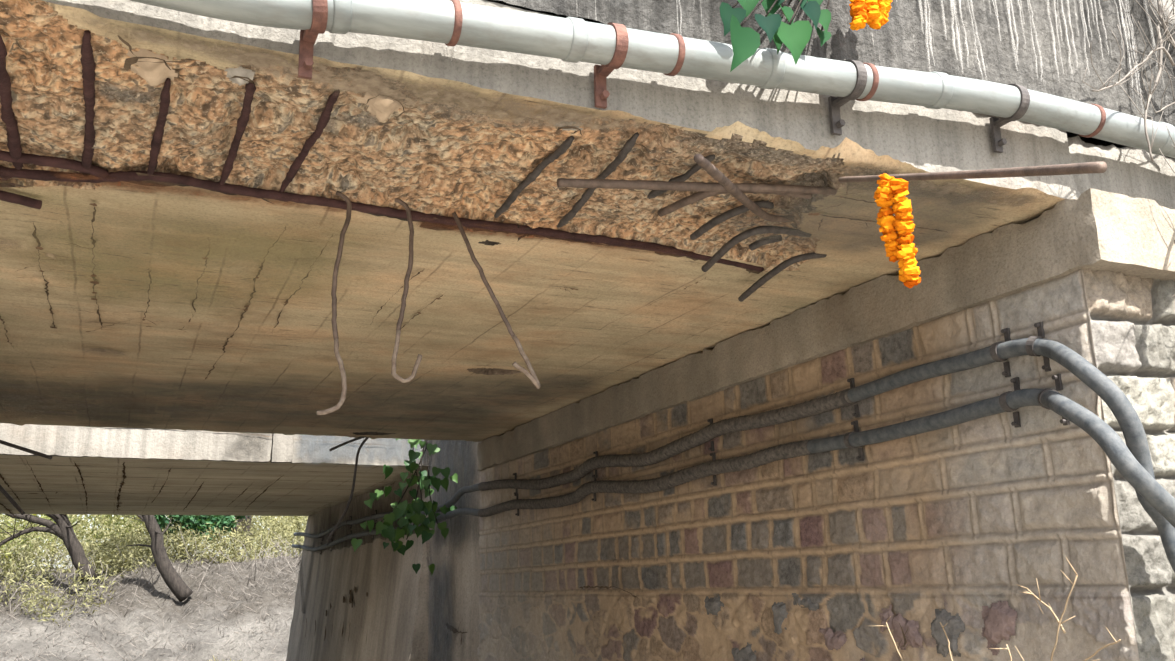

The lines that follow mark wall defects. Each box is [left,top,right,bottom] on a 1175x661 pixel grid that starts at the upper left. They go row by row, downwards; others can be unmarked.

corrosion [60,174,210,196]
crack [367,213,611,246]
corrosion [420,222,638,249]
spalling [0,0,1107,415]
crack [9,172,334,380]
crack [364,270,443,335]
crack [0,458,171,517]